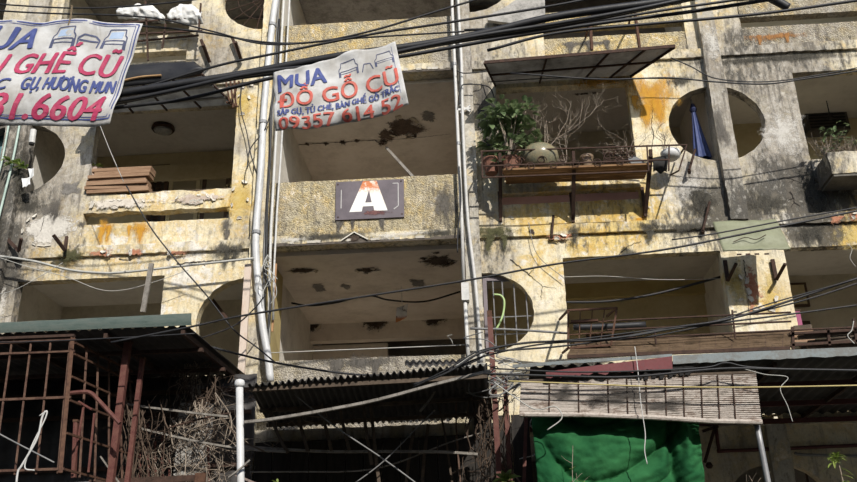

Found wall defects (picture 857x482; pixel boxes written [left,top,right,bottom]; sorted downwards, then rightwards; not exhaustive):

corrosion [749,32,804,45]
damp [575,76,690,124]
spalling [82,180,248,210]
damp [637,176,716,241]
corrosion [97,222,111,242]
corrosion [127,224,149,242]
flaking render [738,264,779,312]